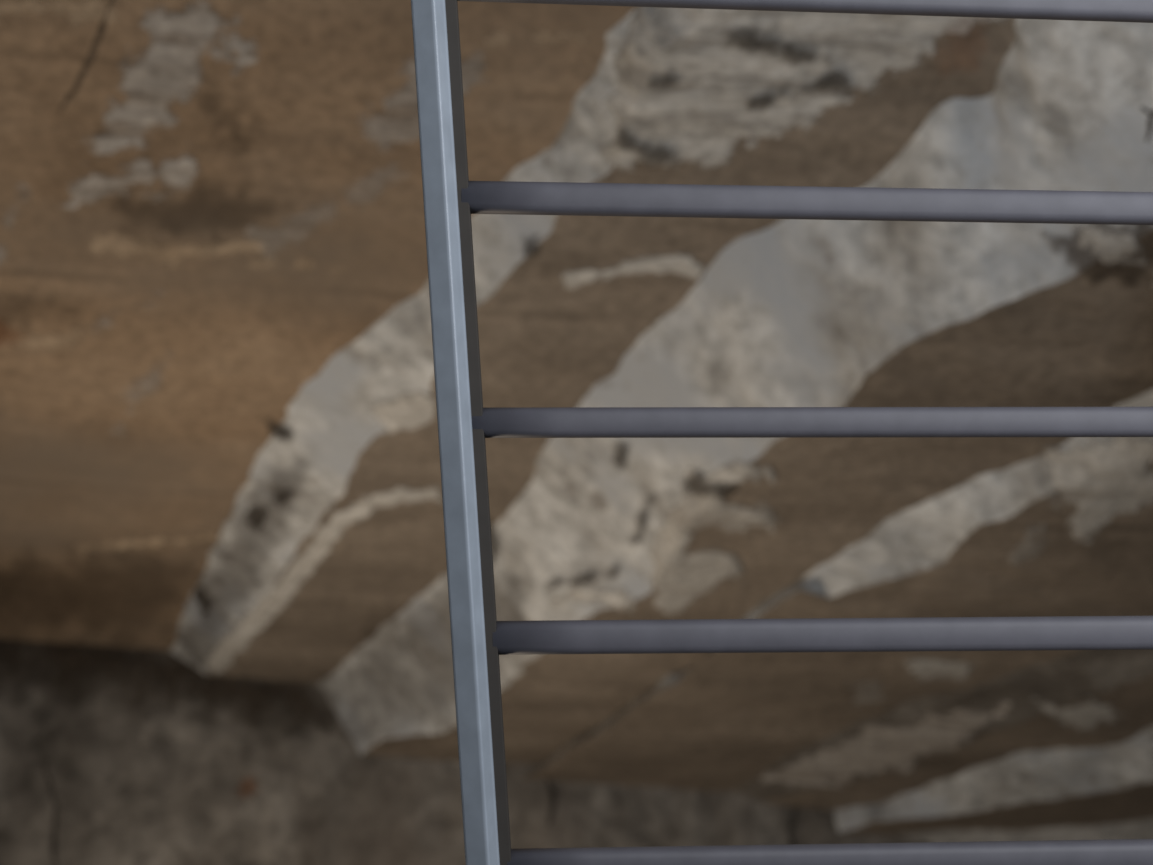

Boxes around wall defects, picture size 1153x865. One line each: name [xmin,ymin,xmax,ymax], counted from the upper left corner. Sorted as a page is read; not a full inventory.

crack [59,0,116,113]
peeling [65,1,257,209]
peeling [599,7,1003,171]
crack [1141,106,1153,142]
peeling [562,254,704,289]
peeling [1079,226,1145,265]
peeling [370,391,436,434]
peeling [205,488,442,674]
peeling [631,462,780,614]
peeling [1044,437,1153,544]
peeling [760,701,1013,790]
peeling [1031,697,1126,731]